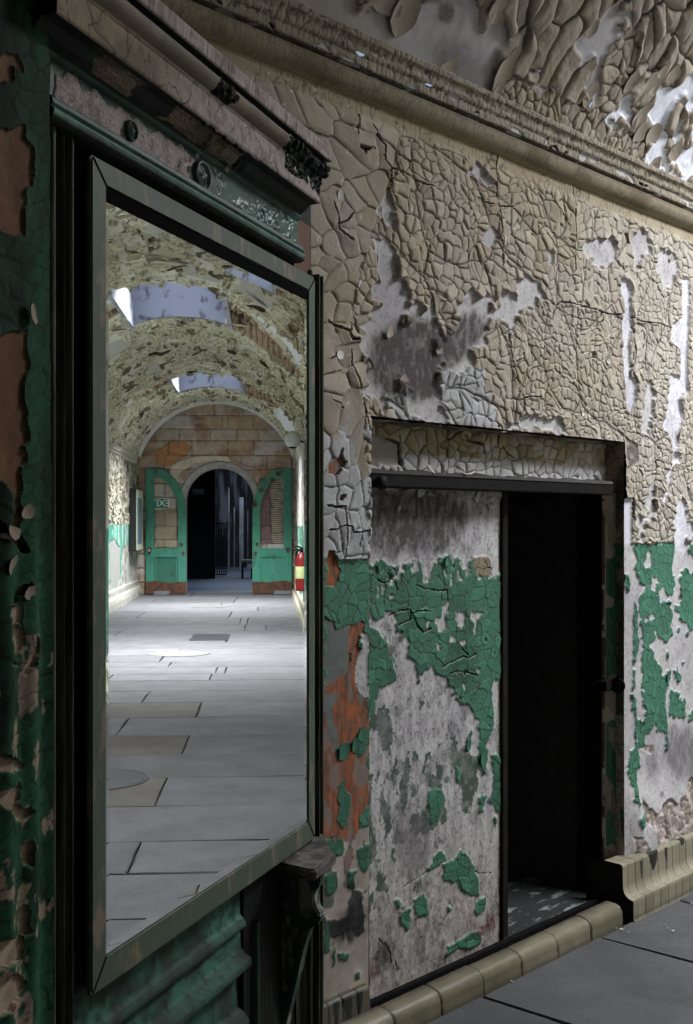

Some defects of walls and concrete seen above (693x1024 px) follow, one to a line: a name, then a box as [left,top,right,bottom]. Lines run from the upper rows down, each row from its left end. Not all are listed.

peeling [297,0,522,97]
crack [356,113,434,186]
peeling [605,62,693,183]
crack [328,319,402,466]
peeling [358,191,546,424]
crack [553,300,672,368]
rust [325,550,341,586]
crack [327,504,371,558]
peeling [582,212,693,855]
crack [628,443,667,517]
rust [324,616,370,870]
peeling [324,488,500,1000]